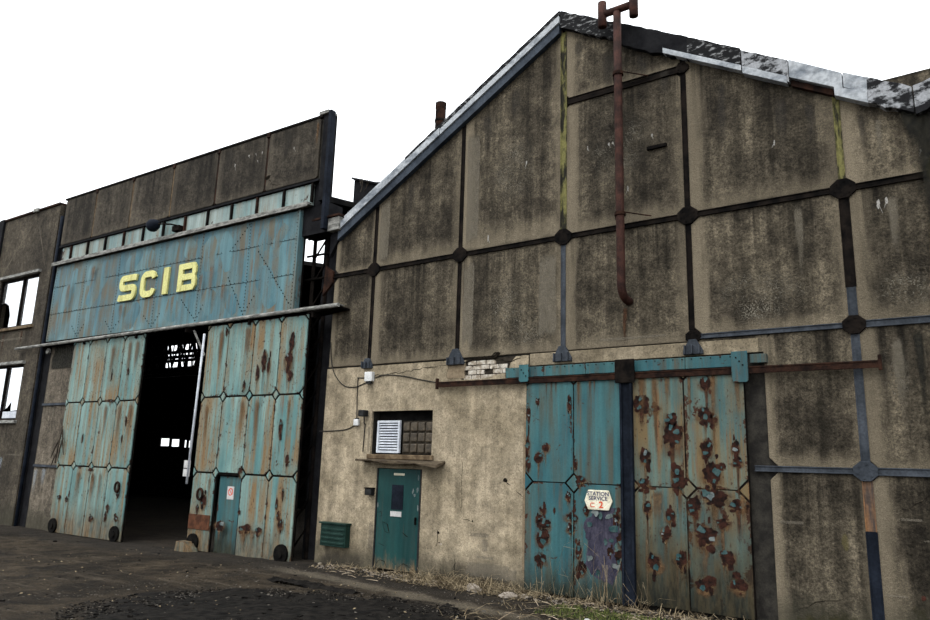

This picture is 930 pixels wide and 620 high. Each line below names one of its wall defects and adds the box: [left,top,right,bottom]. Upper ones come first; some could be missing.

water stain [379,202,390,259]
water stain [466,138,480,240]
water stain [888,199,897,237]
water stain [462,265,474,345]
water stain [491,257,556,343]
flaking render [462,353,515,380]
water stain [885,341,907,400]
rust [103,405,132,427]
peeling [534,502,555,569]
peeling [565,455,622,586]